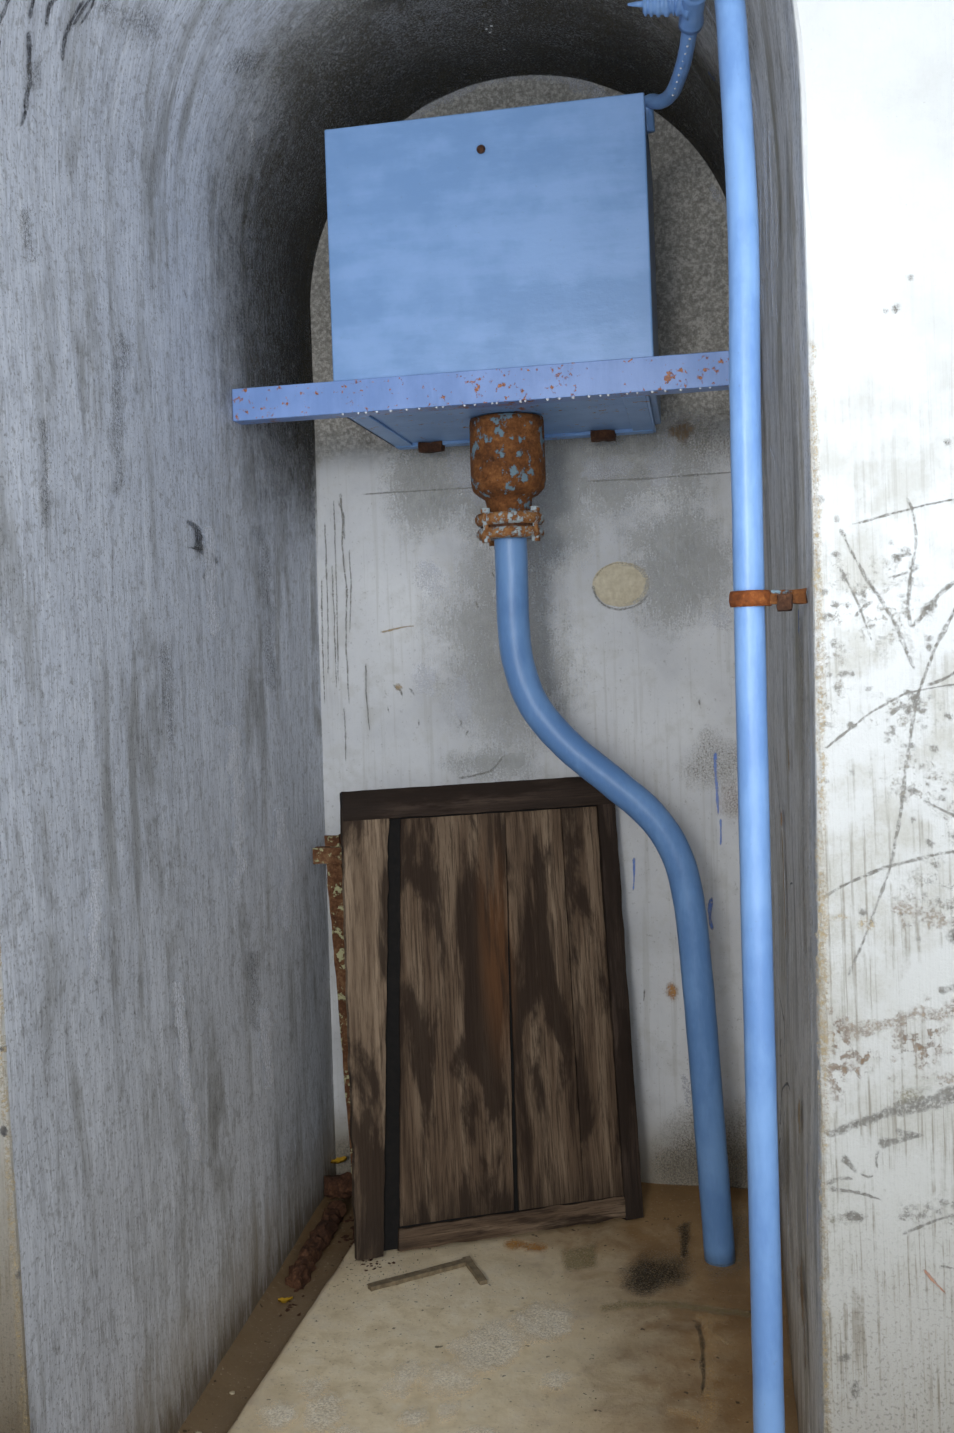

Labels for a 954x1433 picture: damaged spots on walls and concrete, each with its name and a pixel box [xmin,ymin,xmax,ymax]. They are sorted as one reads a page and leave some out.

crack [840,502,954,974]